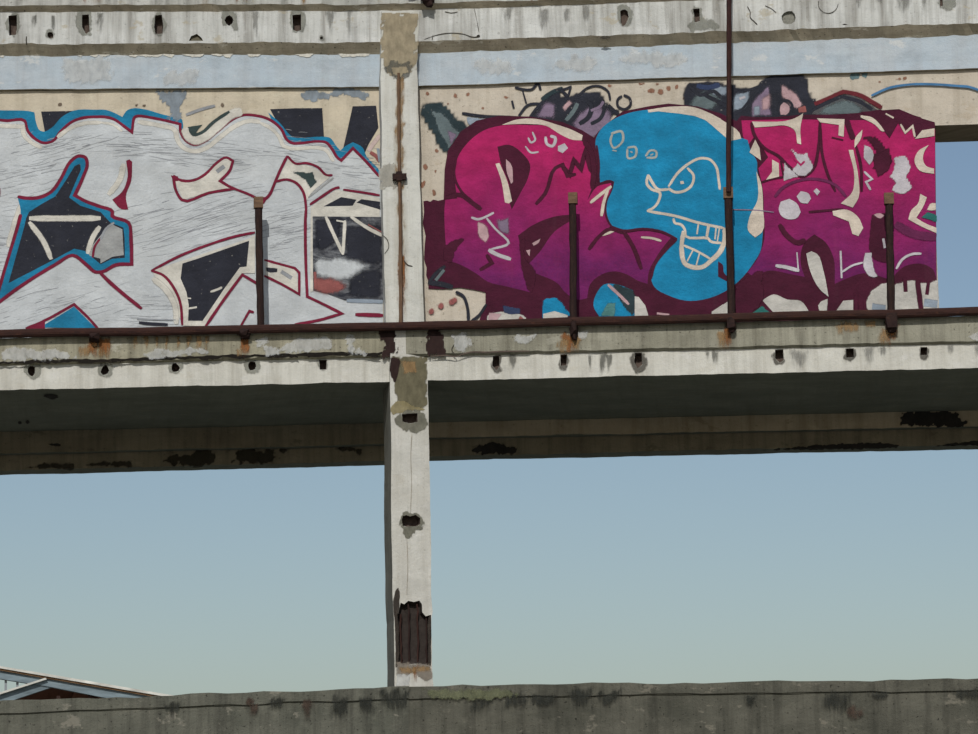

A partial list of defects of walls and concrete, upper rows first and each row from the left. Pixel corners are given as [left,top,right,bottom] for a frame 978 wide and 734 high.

rust [395,78,405,171]
spalling [390,356,428,433]
spalling [399,511,424,538]
spalling [393,588,432,681]